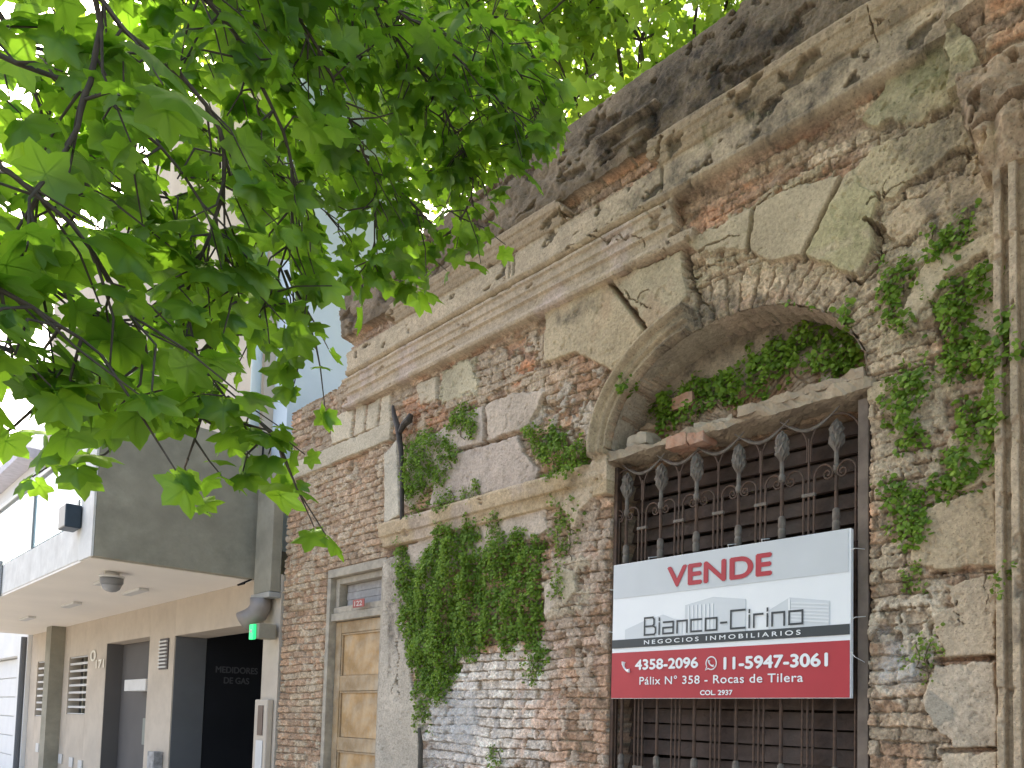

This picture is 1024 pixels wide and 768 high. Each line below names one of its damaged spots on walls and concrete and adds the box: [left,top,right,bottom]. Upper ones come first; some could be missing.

crack [867,5,892,43]
crack [624,289,652,309]